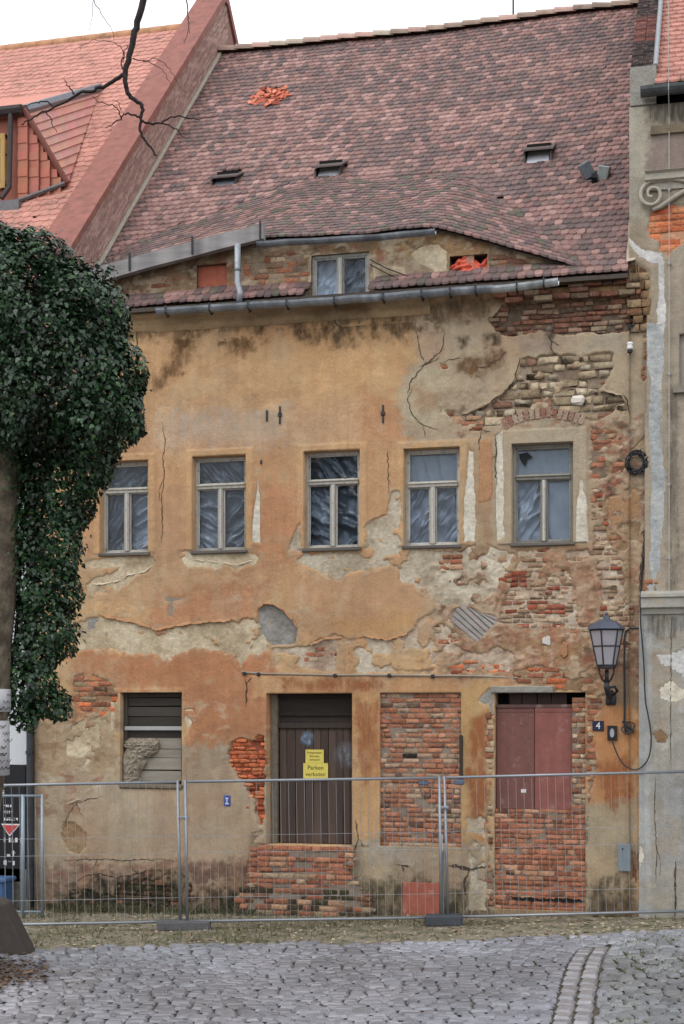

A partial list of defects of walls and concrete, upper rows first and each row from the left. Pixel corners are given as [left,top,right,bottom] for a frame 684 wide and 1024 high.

spalling [248,85,293,107]
leakage [155,326,264,388]
crack [407,327,573,484]
flaking render [488,263,651,381]
crack [158,422,166,541]
flaking render [77,354,658,803]
flaking render [66,674,118,766]
peeling [656,649,684,702]
flaking render [228,735,266,887]